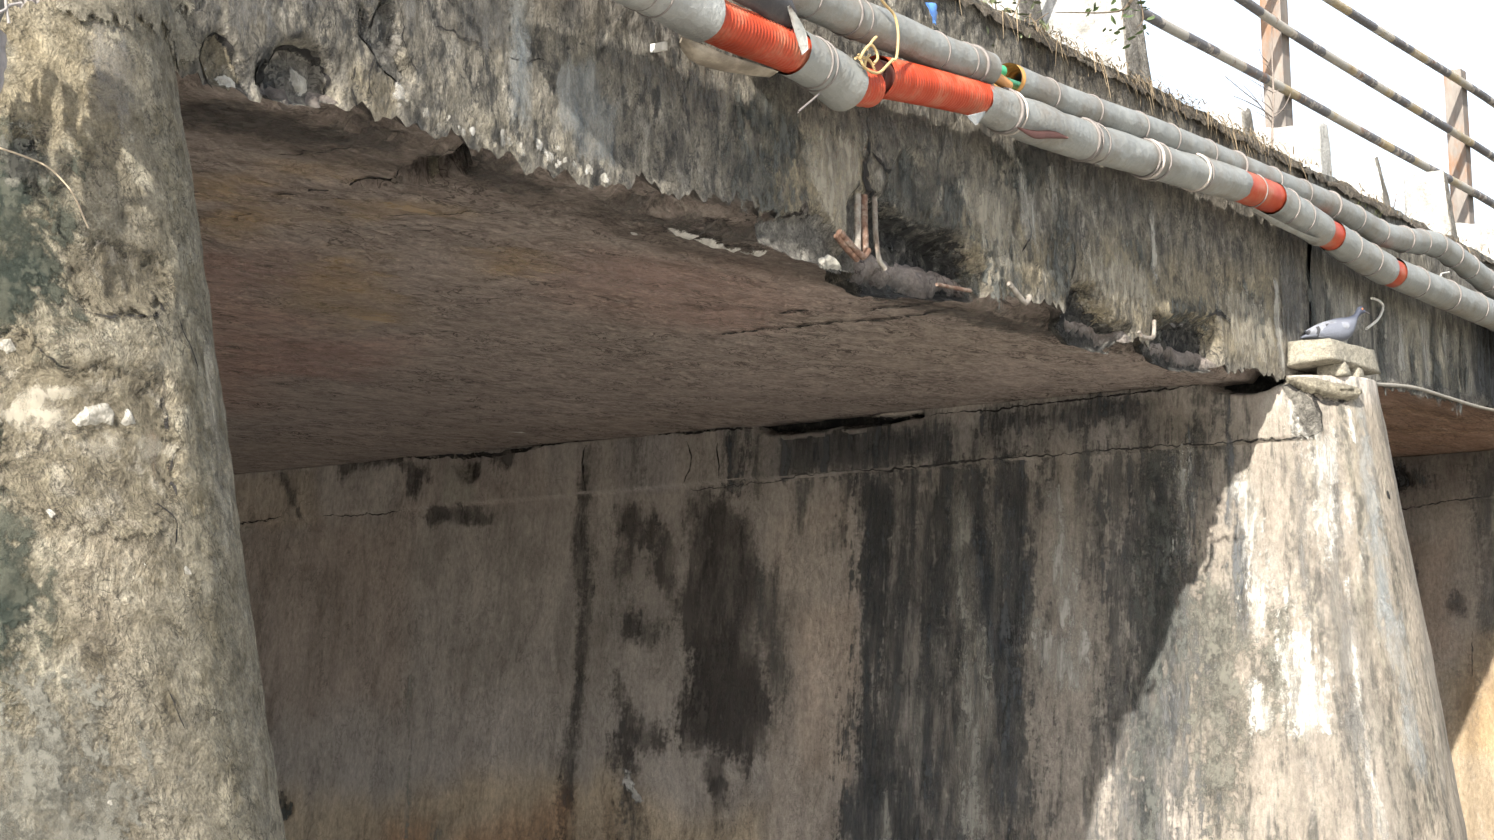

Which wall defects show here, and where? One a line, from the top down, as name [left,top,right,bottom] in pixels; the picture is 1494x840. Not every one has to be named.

spalling [198,35,326,106]
crack [232,147,524,222]
spalling [754,131,1013,303]
crack [709,300,956,336]
spalling [1048,252,1323,439]
damp [337,457,493,528]
crack [408,441,585,483]
crack [658,384,1345,491]
damp [1392,458,1436,492]
damp [559,475,595,808]
damp [606,427,790,840]
damp [779,387,1387,840]